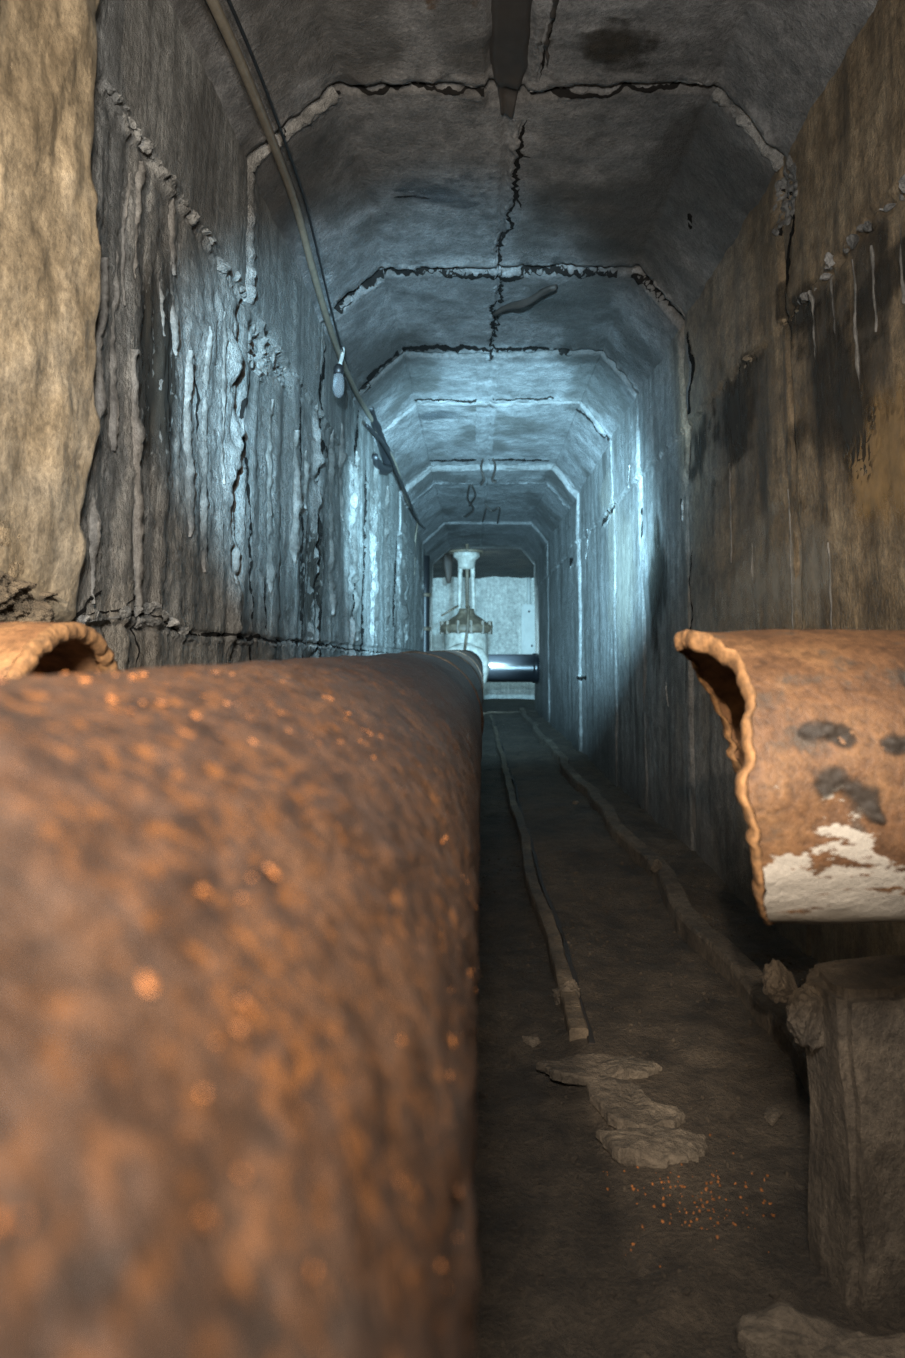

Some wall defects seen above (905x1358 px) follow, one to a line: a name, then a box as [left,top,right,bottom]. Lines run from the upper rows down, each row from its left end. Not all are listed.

spalling [101,80,247,298]
spalling [247,322,292,388]
crack [75,0,702,668]
water stain [776,224,905,478]
water stain [684,353,757,562]
spalling [0,571,58,623]
spalling [71,609,100,625]
spalling [118,601,190,636]
water stain [734,489,832,629]